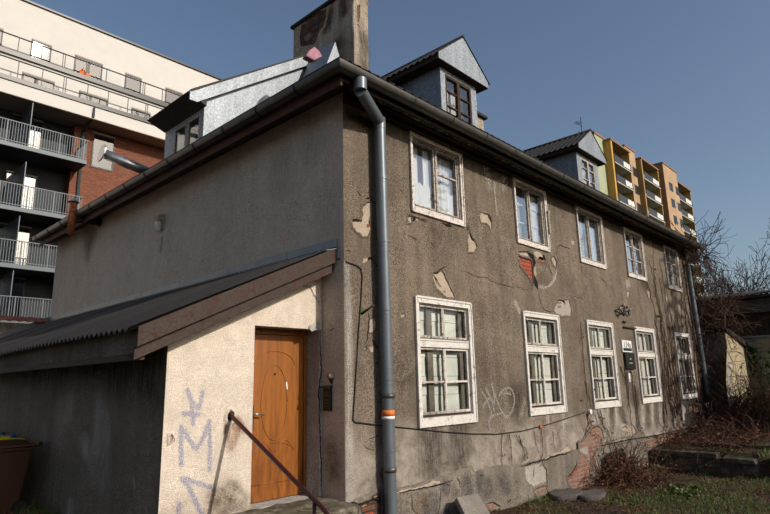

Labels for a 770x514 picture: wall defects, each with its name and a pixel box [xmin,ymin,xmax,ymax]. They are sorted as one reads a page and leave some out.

flaking render [298,2,334,49]
flaking render [350,197,374,239]
flaking render [466,225,478,255]
flaking render [479,210,493,234]
flaking render [431,267,456,300]
flaking render [516,251,557,289]
flaking render [552,297,572,319]
flaking render [350,468,384,514]
flaking render [525,463,549,498]
crack [515,447,571,488]
flaking render [566,424,628,489]